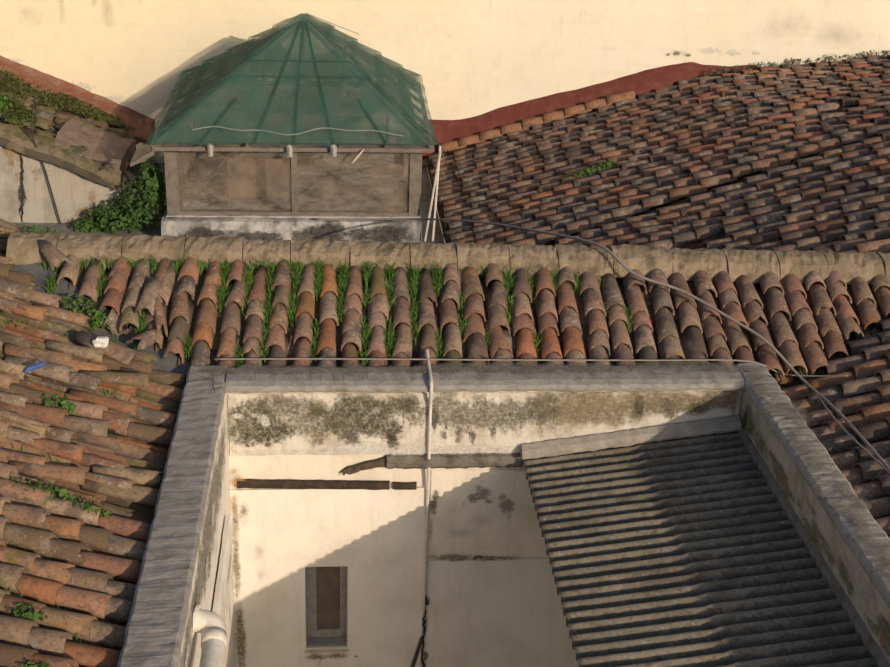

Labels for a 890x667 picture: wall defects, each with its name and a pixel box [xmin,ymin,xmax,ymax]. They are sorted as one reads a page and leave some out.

crack [19,137,27,223]
damp [229,391,731,447]
damp [469,486,512,518]
crack [421,596,429,667]